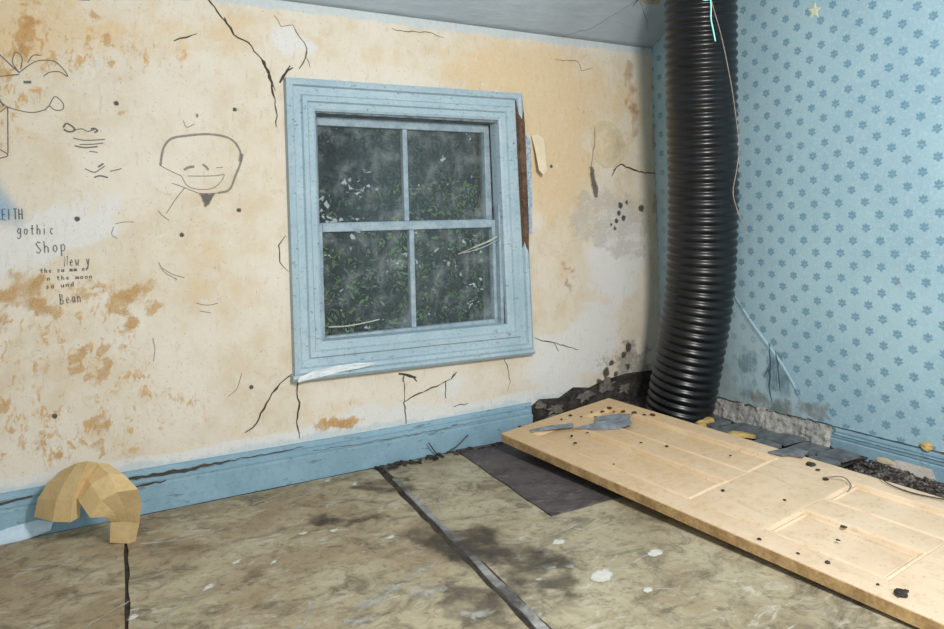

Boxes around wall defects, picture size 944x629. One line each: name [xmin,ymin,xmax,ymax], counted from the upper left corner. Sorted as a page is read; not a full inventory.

crack [208,0,311,127]
leakage [610,200,644,230]
leakage [597,343,631,383]
crack [245,374,300,439]
crack [398,372,468,417]